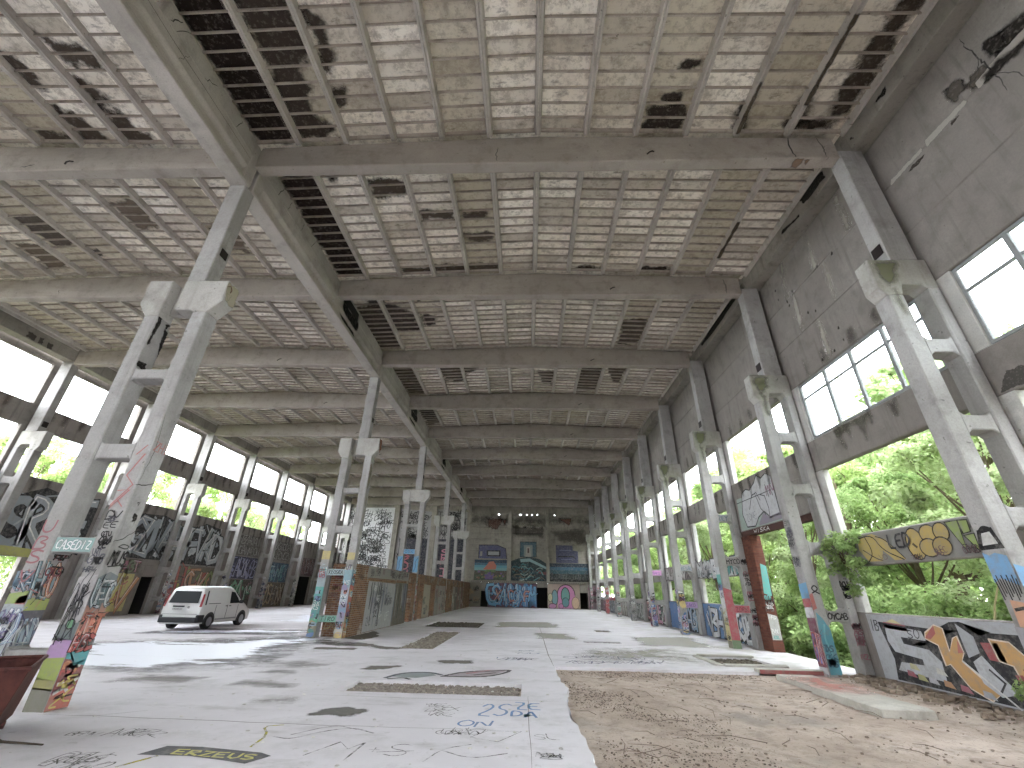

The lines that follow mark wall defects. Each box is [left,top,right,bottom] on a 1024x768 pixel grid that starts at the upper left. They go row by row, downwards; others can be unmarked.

crack [959,39,1024,90]
spalling [975,29,1024,89]
spalling [890,100,968,185]
spalling [1001,365,1024,393]